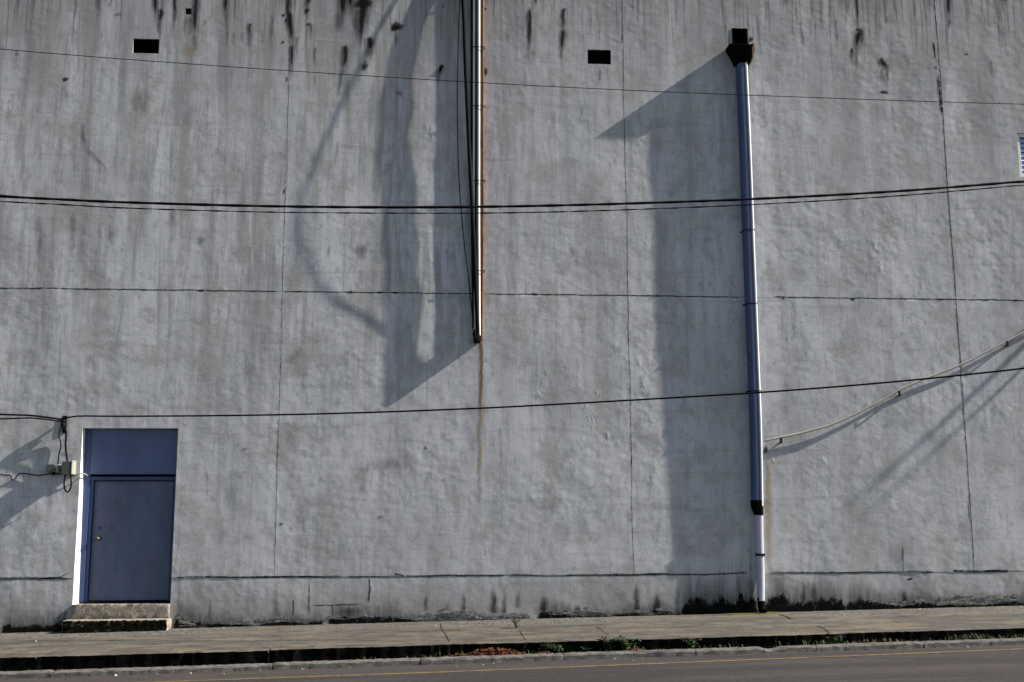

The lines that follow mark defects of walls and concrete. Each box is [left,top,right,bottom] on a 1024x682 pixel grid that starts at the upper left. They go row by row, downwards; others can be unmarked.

damp [153,0,200,46]
damp [271,0,298,65]
damp [338,0,374,69]
damp [851,0,864,61]
damp [439,595,506,621]
damp [538,582,1024,619]